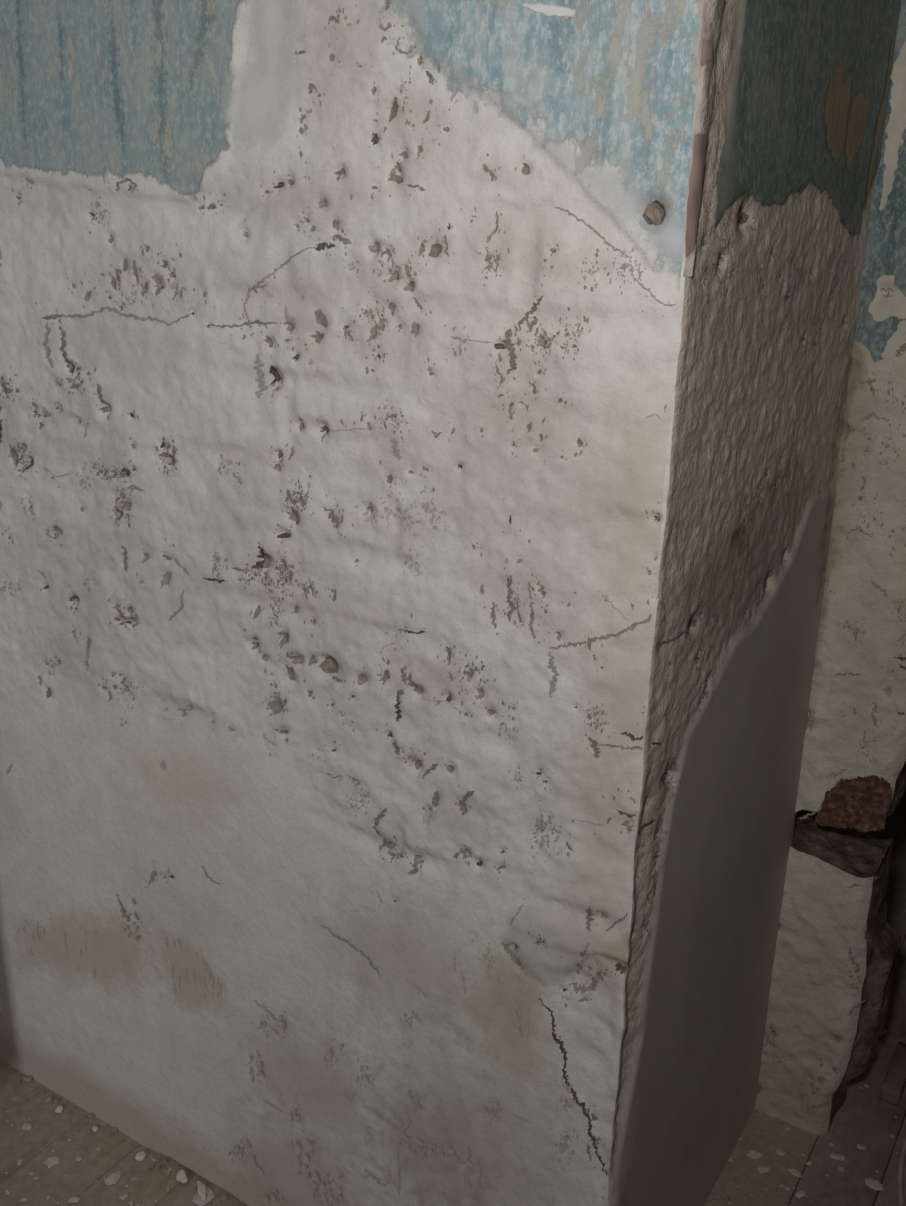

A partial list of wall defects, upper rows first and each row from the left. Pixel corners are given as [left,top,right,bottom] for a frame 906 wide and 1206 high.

peeling [324,6,359,76]
peeling [0,0,243,311]
peeling [253,303,327,398]
peeling [260,83,324,197]
peeling [295,198,339,241]
peeling [342,0,906,558]
flaking render [796,580,906,833]
crack [538,998,607,1175]